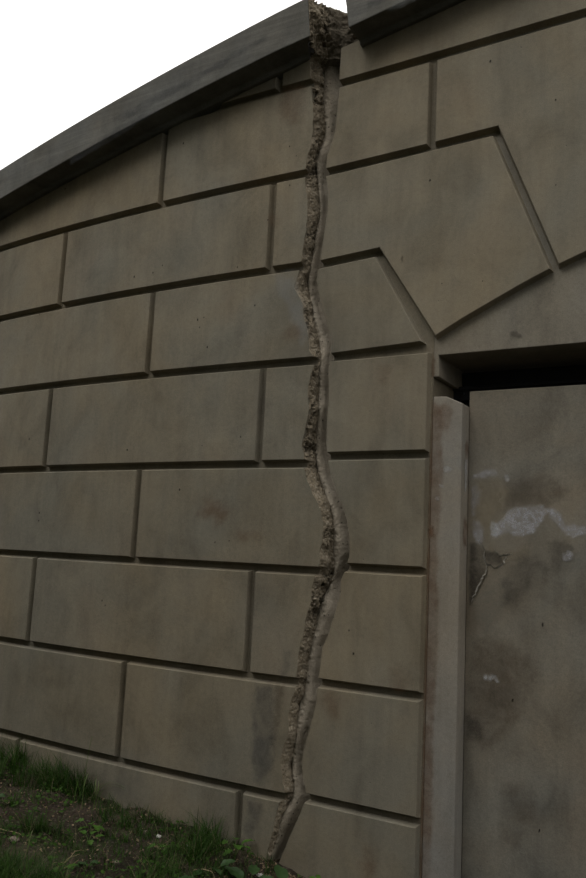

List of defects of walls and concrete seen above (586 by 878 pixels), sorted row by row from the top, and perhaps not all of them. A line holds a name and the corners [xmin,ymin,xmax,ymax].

crack [267,7,358,861]